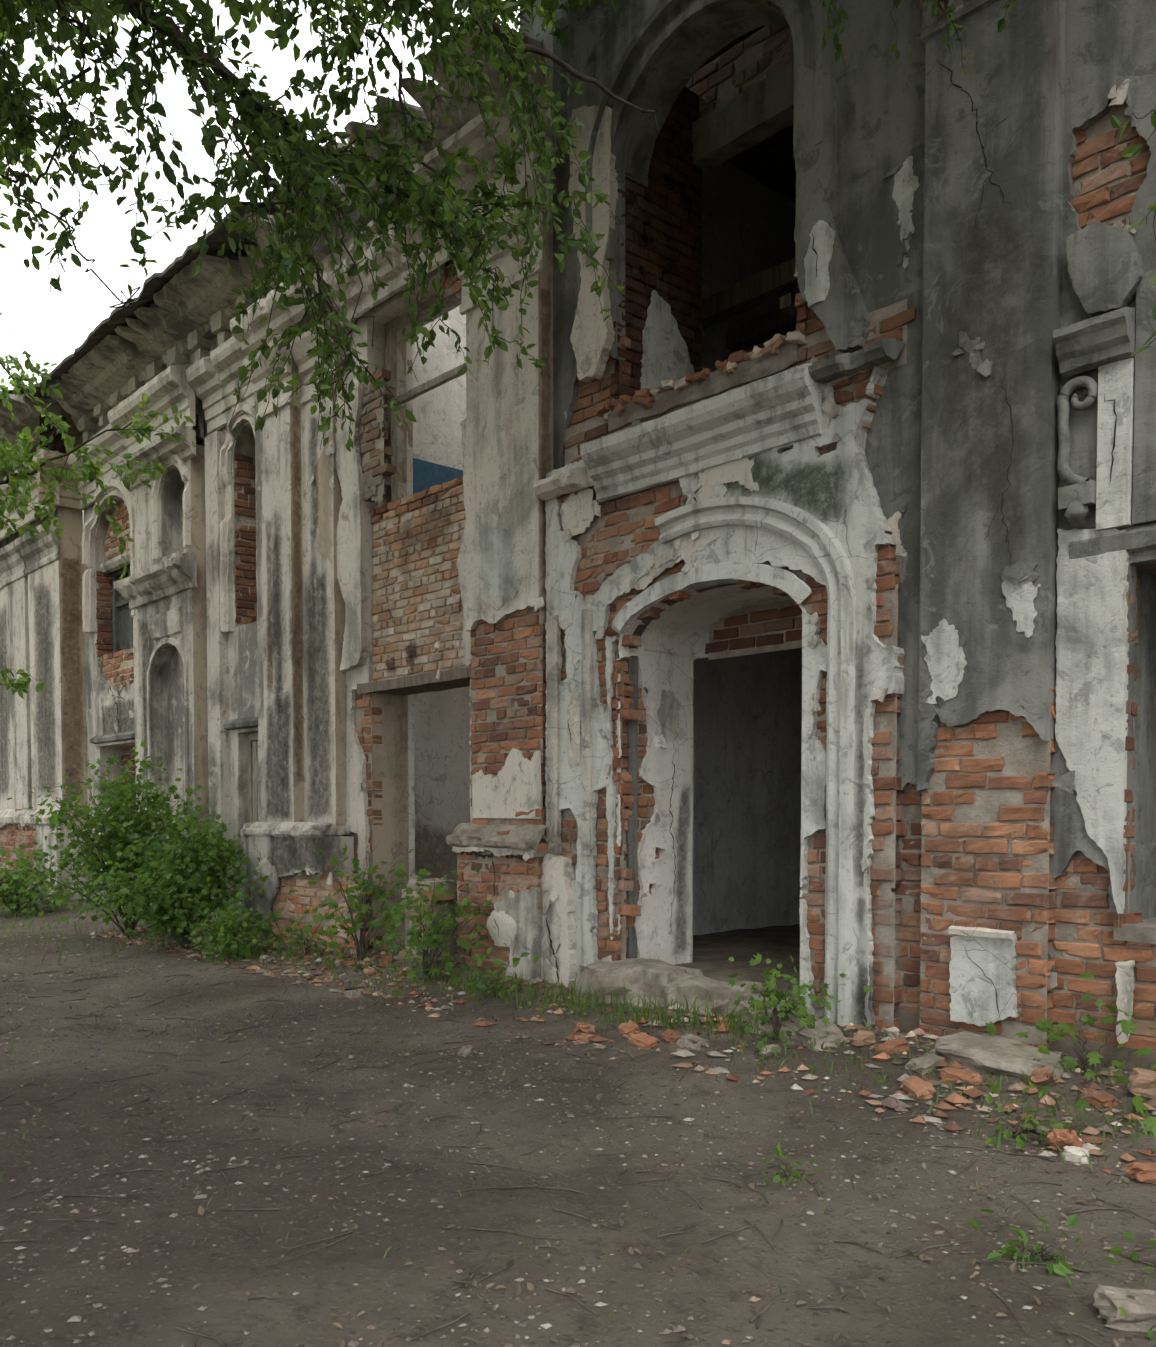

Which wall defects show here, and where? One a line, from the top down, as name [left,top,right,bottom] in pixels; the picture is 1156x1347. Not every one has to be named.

flaking render [803,301,825,336]
flaking render [564,335,642,427]
flaking render [818,370,883,456]
crack [1104,397,1117,482]
flaking render [866,504,908,666]
peeling [1001,560,1040,637]
flaking render [455,454,760,972]
flaking render [852,619,1156,1086]
flaking render [804,829,826,1009]
crack [964,947,1000,1017]